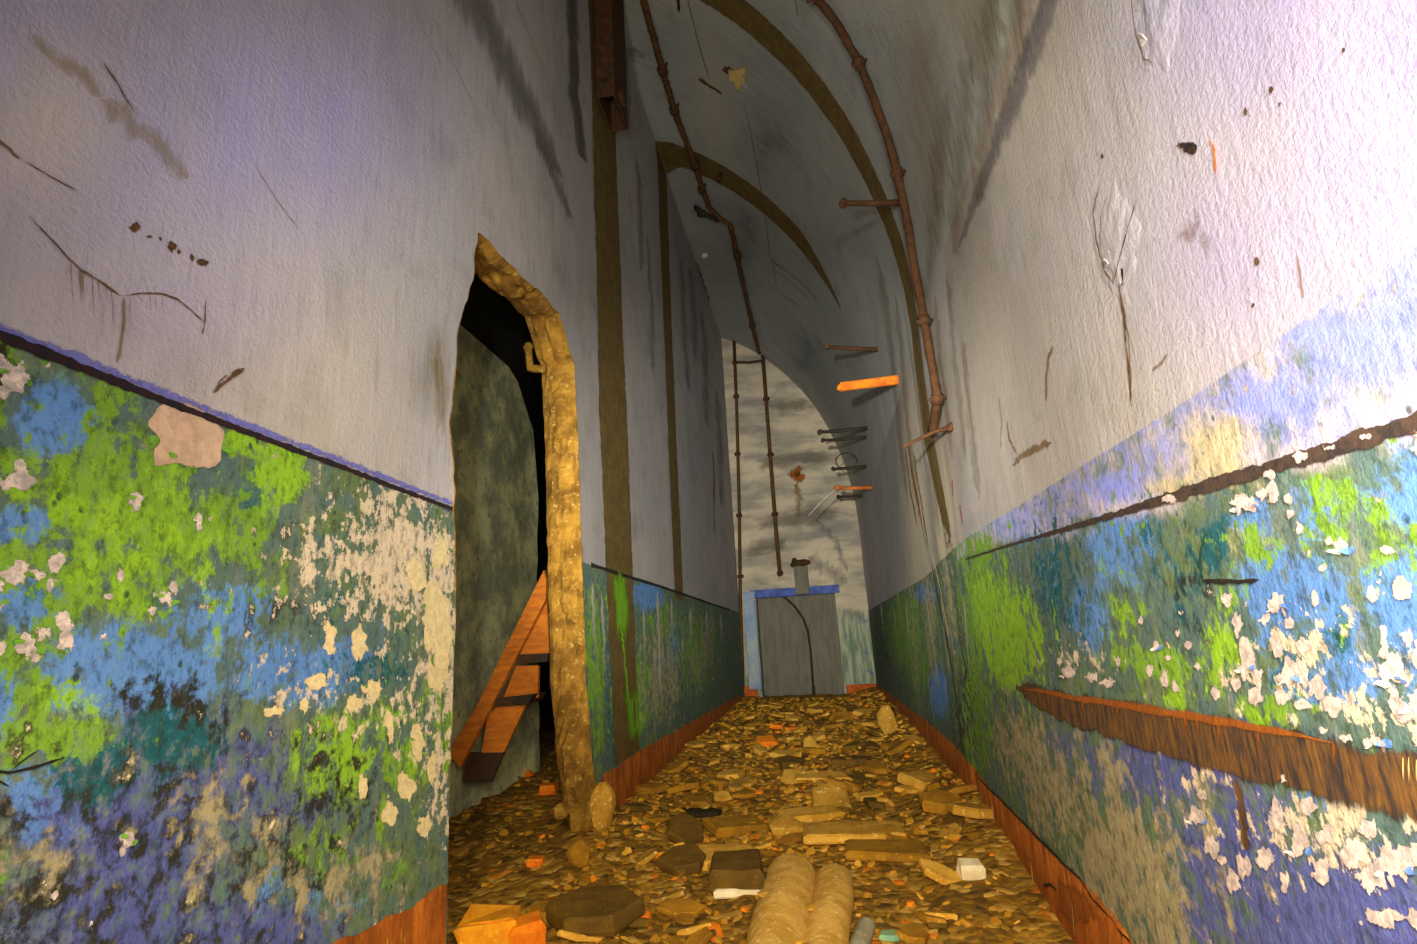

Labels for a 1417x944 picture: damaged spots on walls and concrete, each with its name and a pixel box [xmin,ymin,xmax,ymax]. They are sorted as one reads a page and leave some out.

crack [34,38,182,171]
crack [0,140,76,190]
crack [30,217,206,335]
peeling [148,403,234,473]
peeling [0,552,66,611]
spalling [346,233,596,832]
peeling [1229,469,1304,535]
peeling [0,611,75,663]
peeling [323,618,370,661]
peeling [1198,534,1392,749]
peeling [1374,624,1417,724]
peeling [1186,775,1417,930]